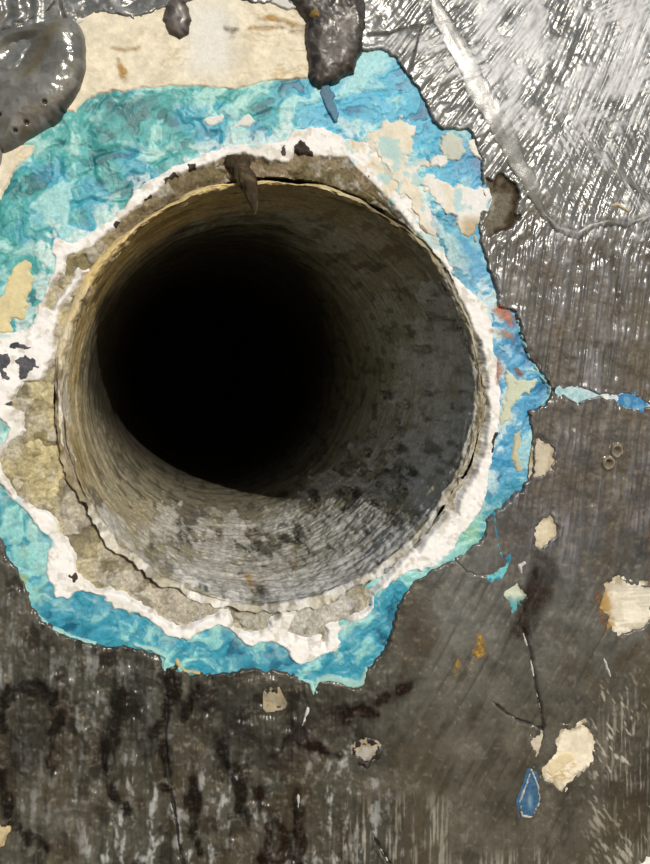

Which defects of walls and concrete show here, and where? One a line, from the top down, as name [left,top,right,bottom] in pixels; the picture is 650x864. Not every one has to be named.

peeling [0,0,557,695]
peeling [555,386,650,413]
peeling [600,575,650,636]
crack [495,628,545,731]
crack [163,669,186,864]
peeling [516,719,595,818]